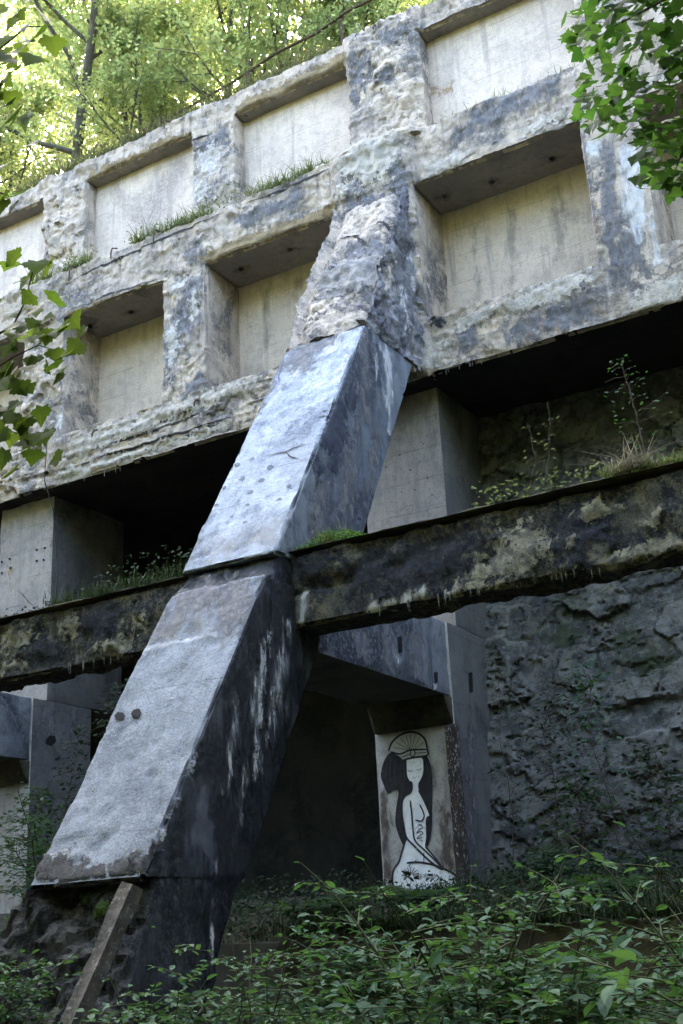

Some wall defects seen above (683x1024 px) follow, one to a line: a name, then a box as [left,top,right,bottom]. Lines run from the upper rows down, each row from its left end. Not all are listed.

leakage [450,74,560,149]
leakage [583,133,661,288]
leakage [502,290,592,349]
leakage [535,491,627,576]
leakage [145,153,497,1013]
leakage [18,632,71,672]
spalling [34,792,182,888]